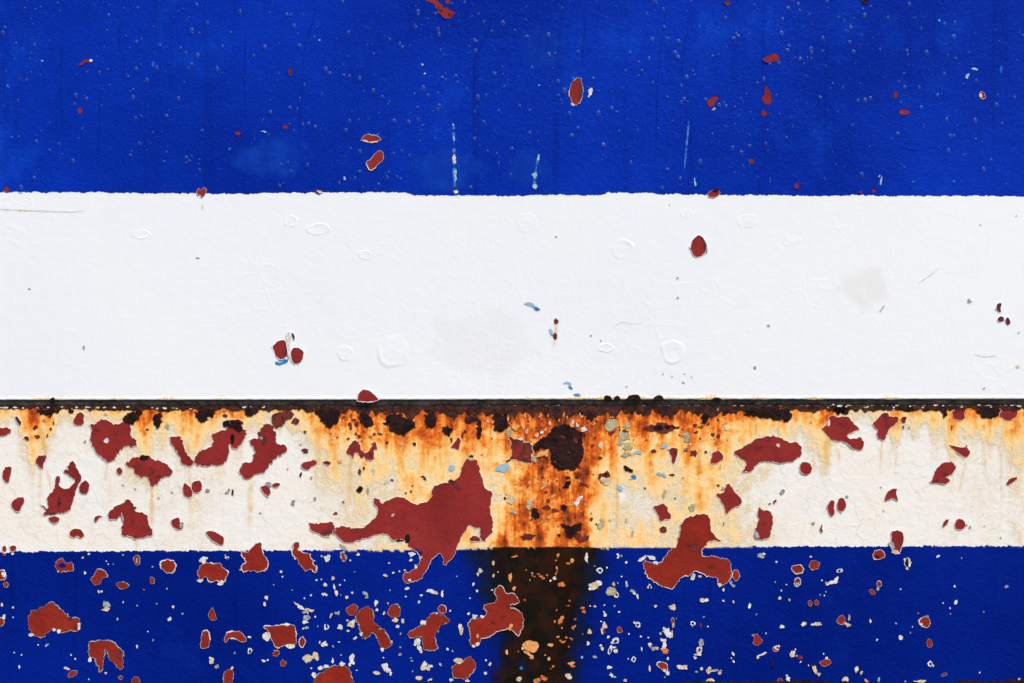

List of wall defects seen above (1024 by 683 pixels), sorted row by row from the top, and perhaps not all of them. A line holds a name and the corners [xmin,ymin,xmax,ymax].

peeling [568,78,593,106]
peeling [690,235,707,258]
peeling [272,332,304,365]
peeling [810,404,864,451]
peeling [0,389,812,683]
rust [0,394,1024,683]